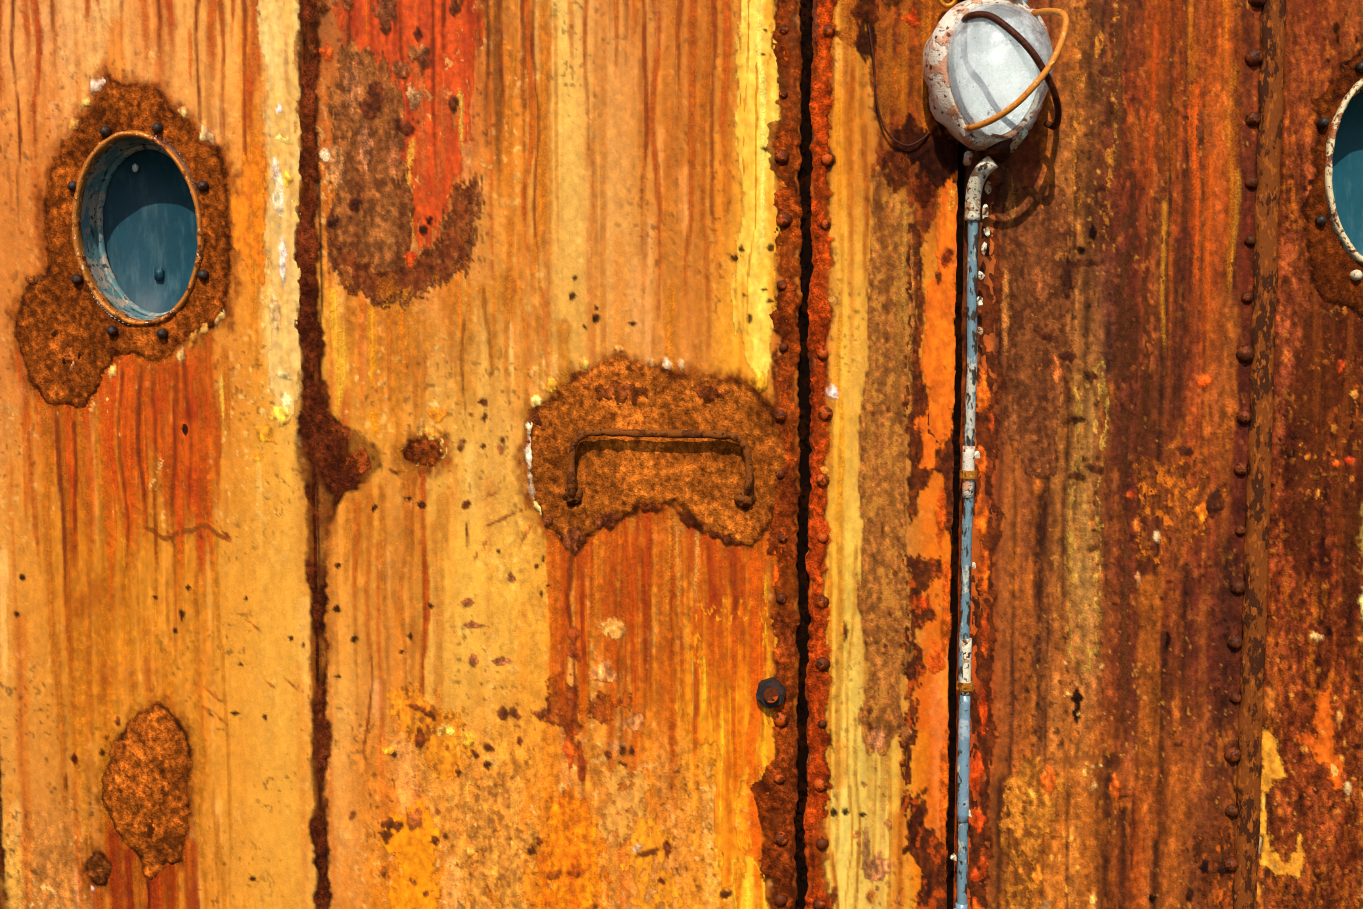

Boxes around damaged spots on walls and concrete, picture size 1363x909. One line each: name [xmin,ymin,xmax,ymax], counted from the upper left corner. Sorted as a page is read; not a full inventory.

rust [0,0,259,909]
rust [294,0,905,909]
peeling [830,0,961,909]
rust [900,0,943,135]
rust [954,174,1007,909]
rust [1107,0,1239,727]
rust [1186,822,1237,909]
rust [1294,36,1363,651]